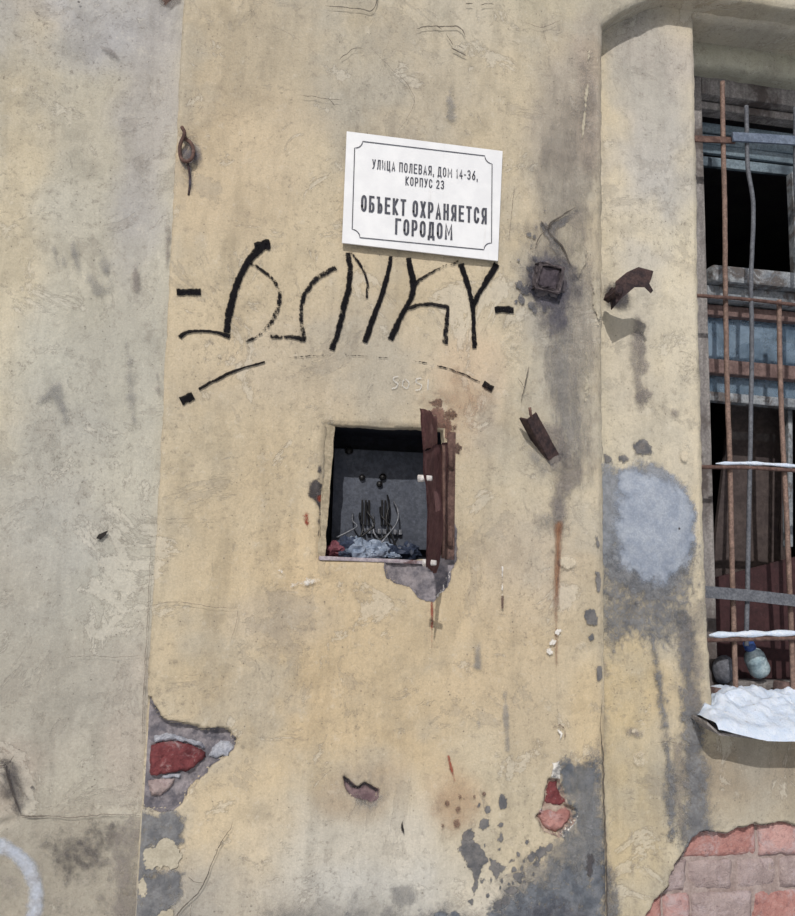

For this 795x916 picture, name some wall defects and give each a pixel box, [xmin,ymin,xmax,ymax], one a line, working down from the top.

water stain [527,182,591,526]
spalling [384,525,457,602]
corrosion [555,522,563,600]
crack [0,756,138,818]
spalling [136,696,236,916]
crack [177,826,232,916]
spalling [343,776,379,804]
peeling [457,757,606,916]
spalling [645,821,795,916]